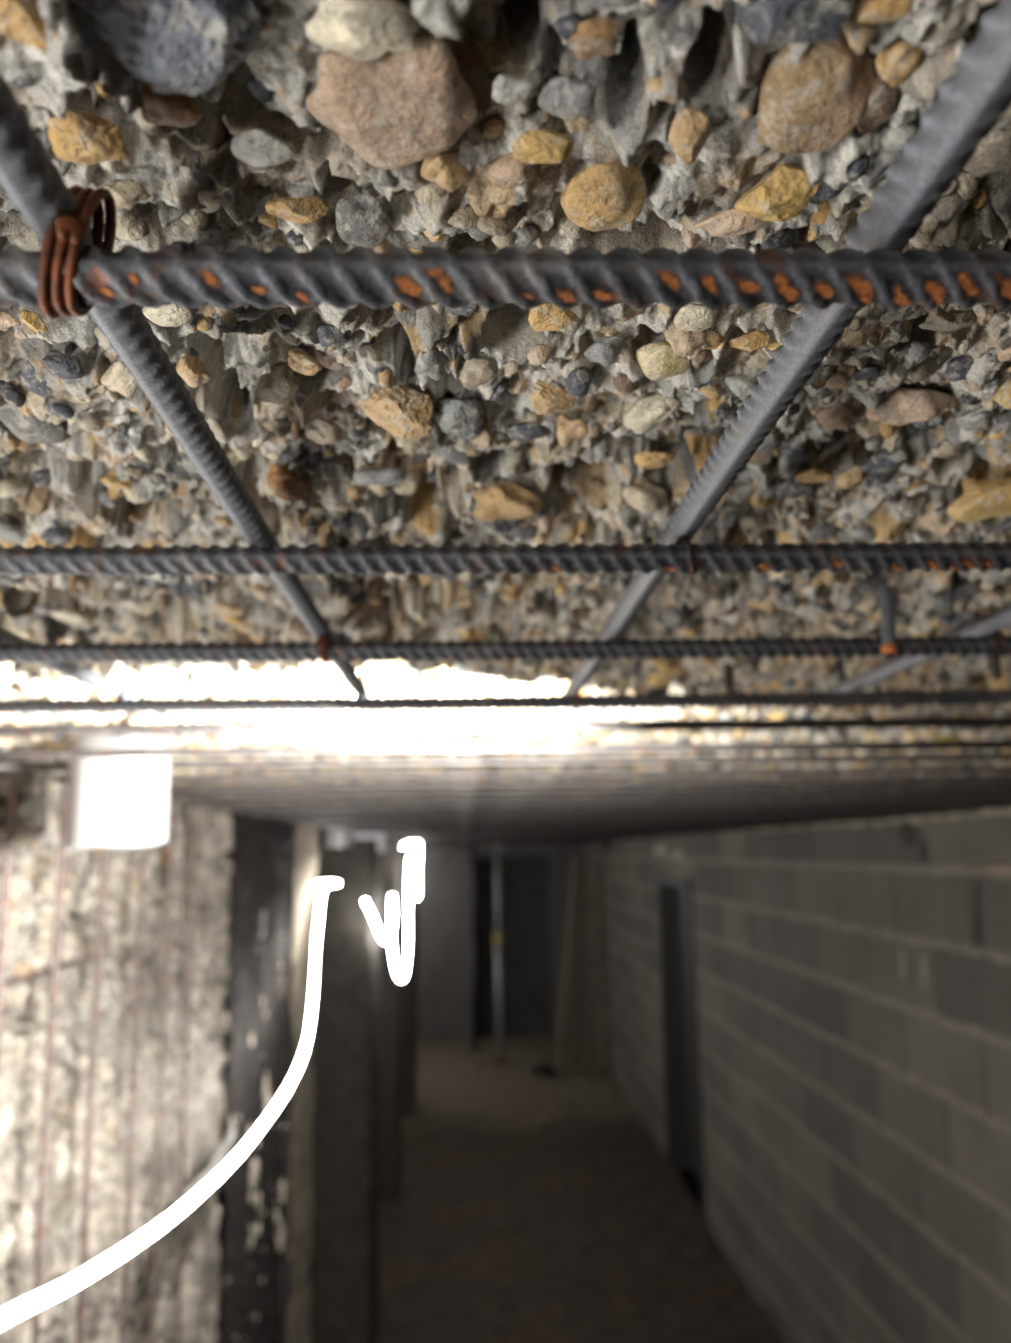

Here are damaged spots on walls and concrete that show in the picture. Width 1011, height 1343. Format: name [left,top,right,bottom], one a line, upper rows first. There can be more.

corrosion [199,271,220,287]
corrosion [394,268,453,297]
corrosion [557,291,576,302]
corrosion [593,290,616,301]
corrosion [654,271,679,291]
corrosion [700,274,717,297]
corrosion [736,273,799,301]
corrosion [813,272,873,305]
corrosion [894,285,910,307]
corrosion [924,273,980,305]
corrosion [998,275,1011,298]